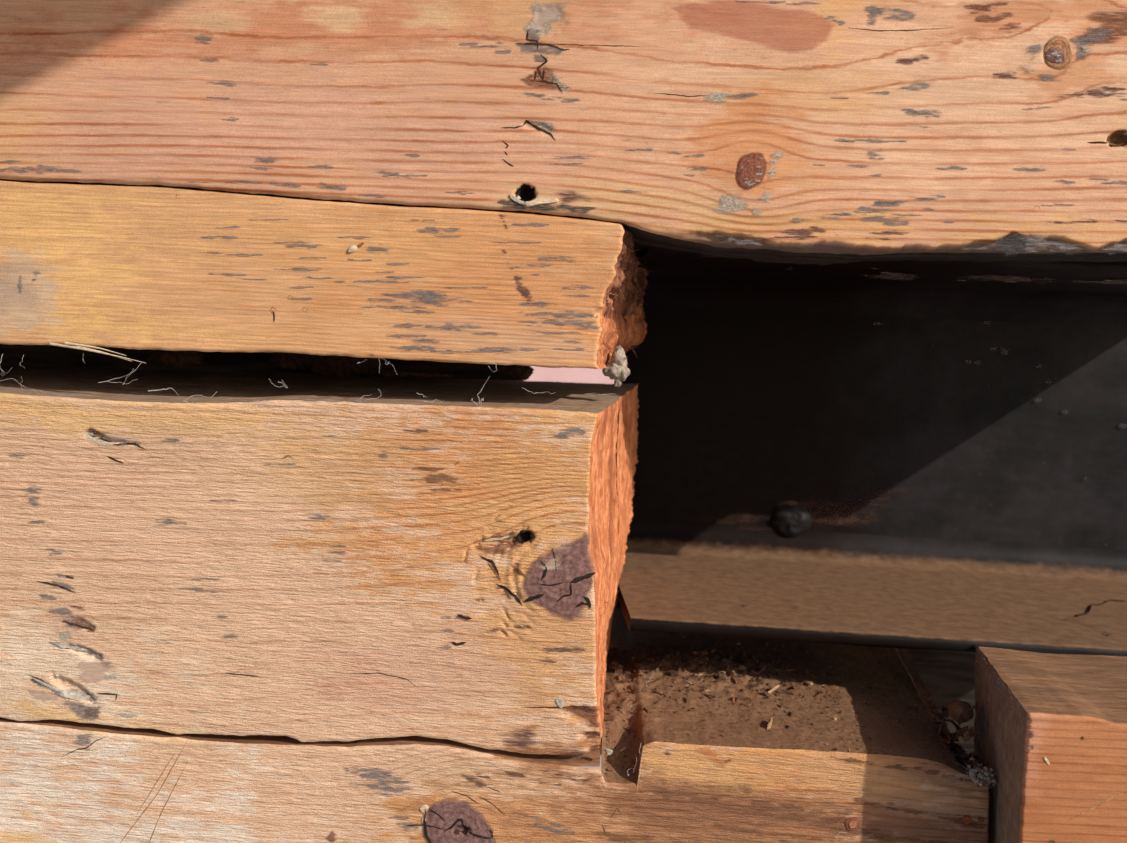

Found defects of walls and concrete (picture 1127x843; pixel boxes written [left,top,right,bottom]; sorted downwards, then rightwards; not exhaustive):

crack [350,673,417,687]
crack [0,717,601,767]